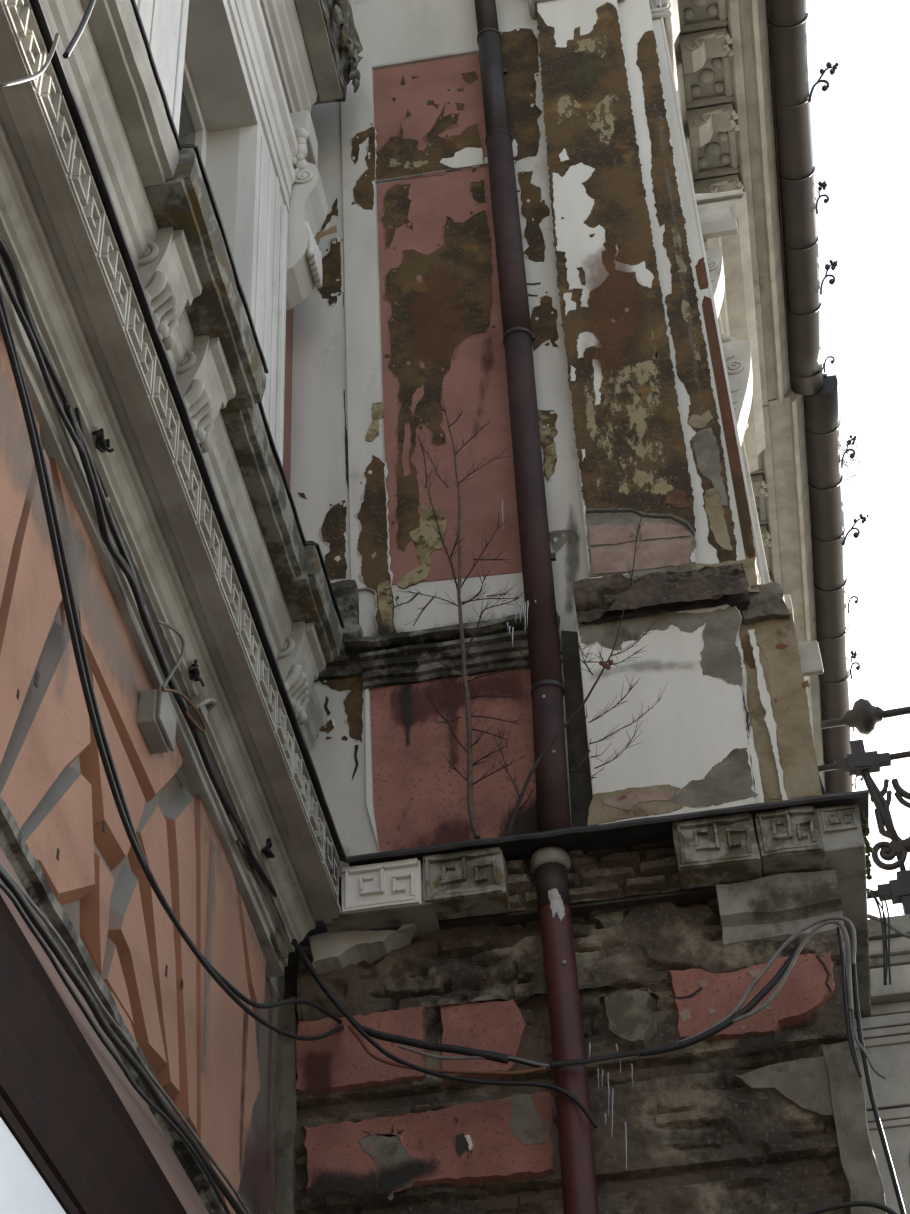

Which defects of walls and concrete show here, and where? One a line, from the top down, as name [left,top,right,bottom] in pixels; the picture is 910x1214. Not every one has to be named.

peeling [315,71,496,634]
peeling [499,2,755,577]
peeling [576,606,821,826]
peeling [548,889,565,921]
flaking render [452,1130,475,1160]